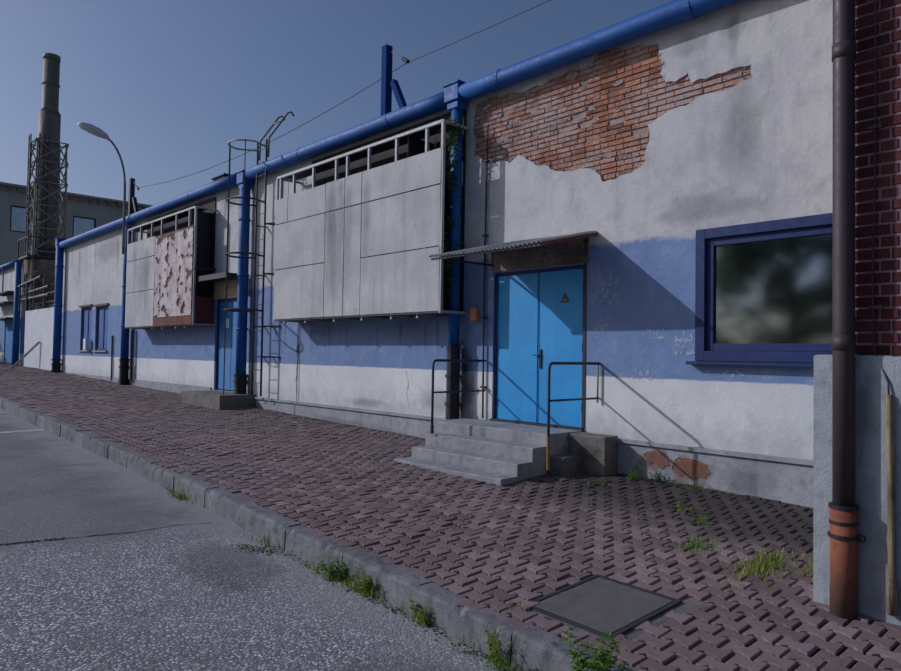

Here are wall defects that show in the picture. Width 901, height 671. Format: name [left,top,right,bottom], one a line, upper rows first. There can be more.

flaking render [474,40,753,181]
flaking render [643,450,711,479]